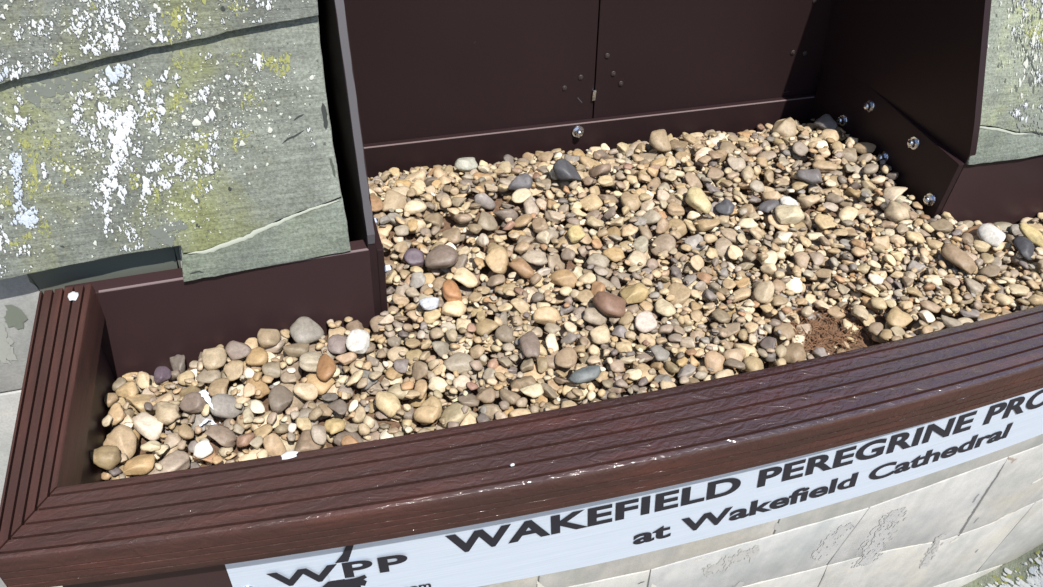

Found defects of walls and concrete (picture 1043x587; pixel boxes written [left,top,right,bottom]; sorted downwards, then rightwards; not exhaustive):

water stain [24,67,110,109]
water stain [27,217,187,294]
crack [959,457,1018,553]